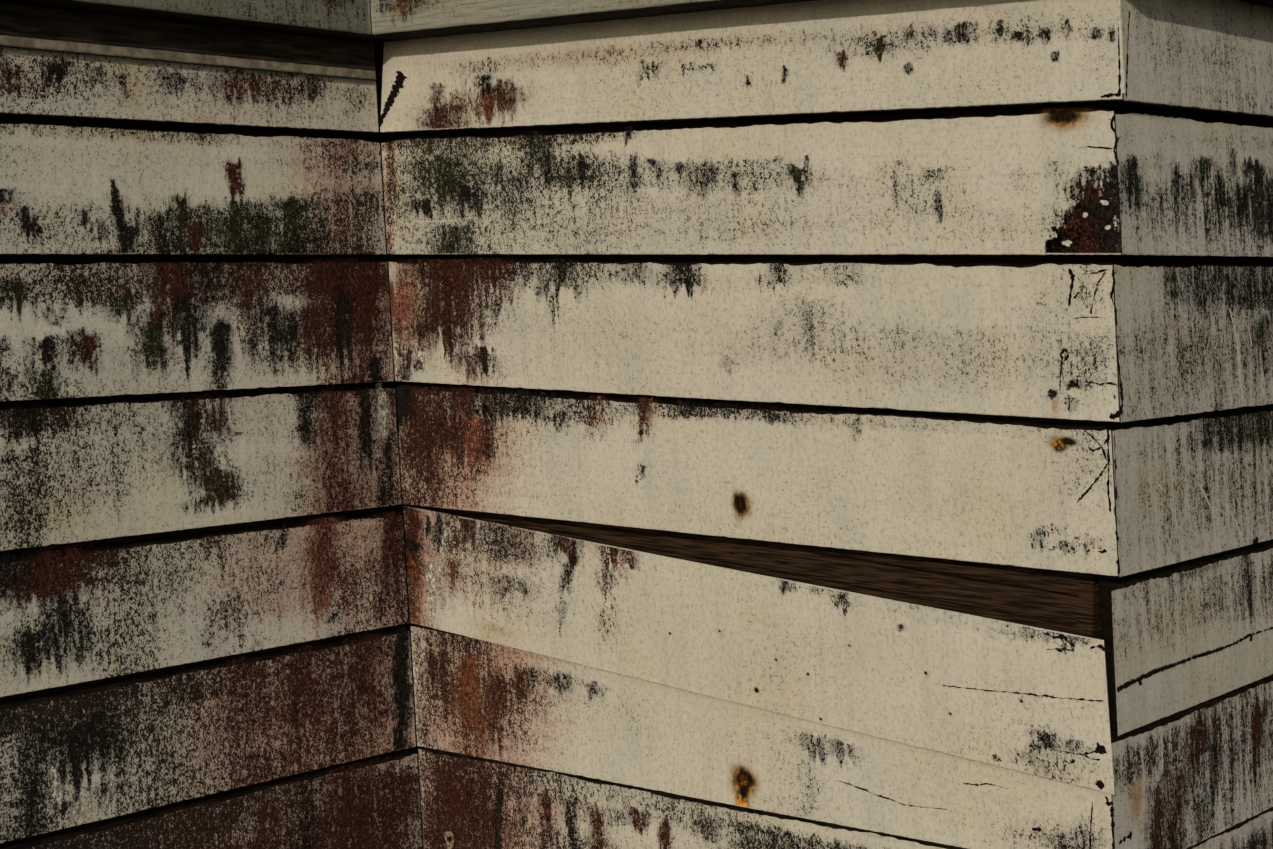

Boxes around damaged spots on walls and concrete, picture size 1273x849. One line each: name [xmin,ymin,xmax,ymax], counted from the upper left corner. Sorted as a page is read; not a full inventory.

rust [416,72,532,129]
leakage [625,123,742,201]
leakage [765,155,816,198]
leakage [1118,148,1273,246]
leakage [1160,261,1273,383]
rust [1053,438,1076,451]
leakage [0,127,628,849]
rust [734,494,750,515]
crack [942,268,1273,764]
rust [733,768,756,807]
crack [1089,796,1115,849]
rust [1143,765,1191,849]